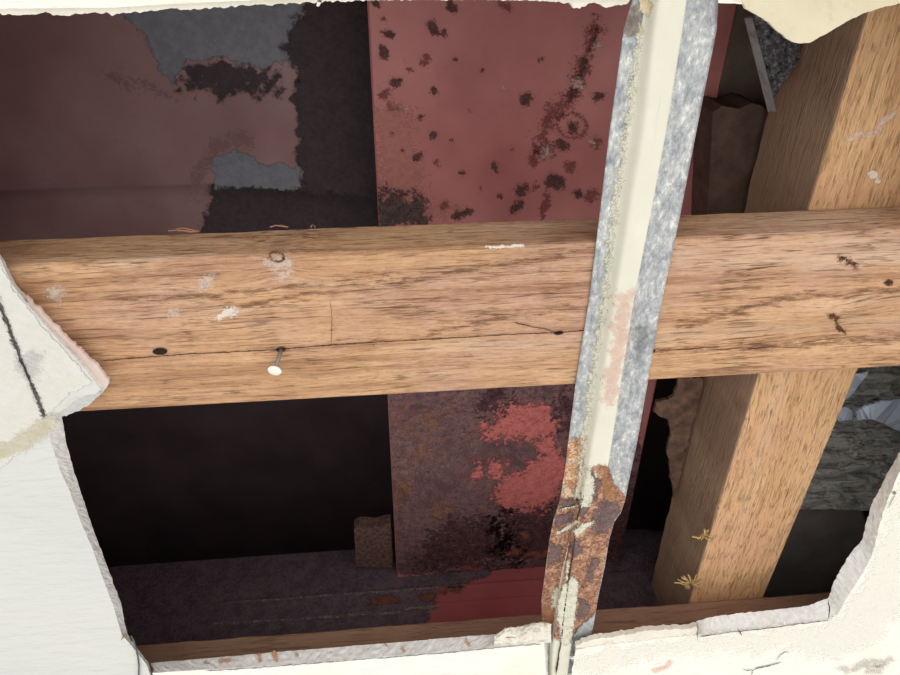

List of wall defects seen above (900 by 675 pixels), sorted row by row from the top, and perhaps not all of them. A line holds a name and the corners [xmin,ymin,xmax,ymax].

peeling [120,0,465,234]
rust [371,0,395,60]
rust [377,54,432,99]
rust [425,18,448,37]
rust [440,201,475,220]
rust [509,13,608,221]
peeling [468,0,653,517]
crack [0,304,47,416]
rust [108,384,664,646]
peeling [551,482,900,675]